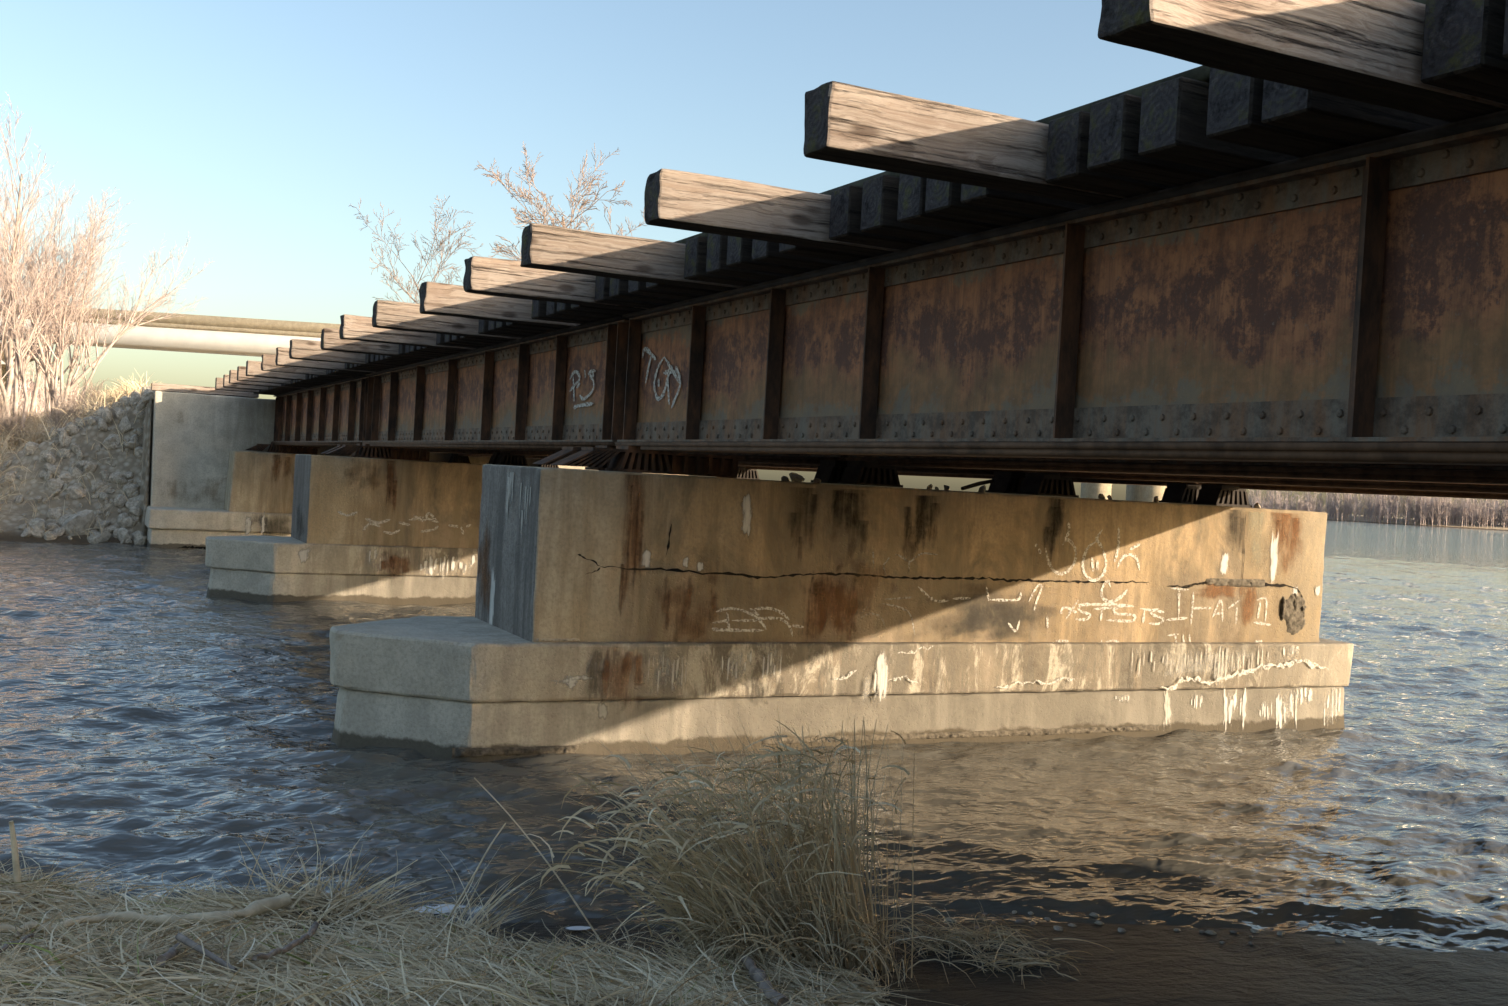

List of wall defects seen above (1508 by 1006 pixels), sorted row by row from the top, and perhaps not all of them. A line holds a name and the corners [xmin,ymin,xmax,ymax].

crack [578,524,1206,588]
crack [1242,517,1303,597]
efflorescence [1132,646,1341,730]